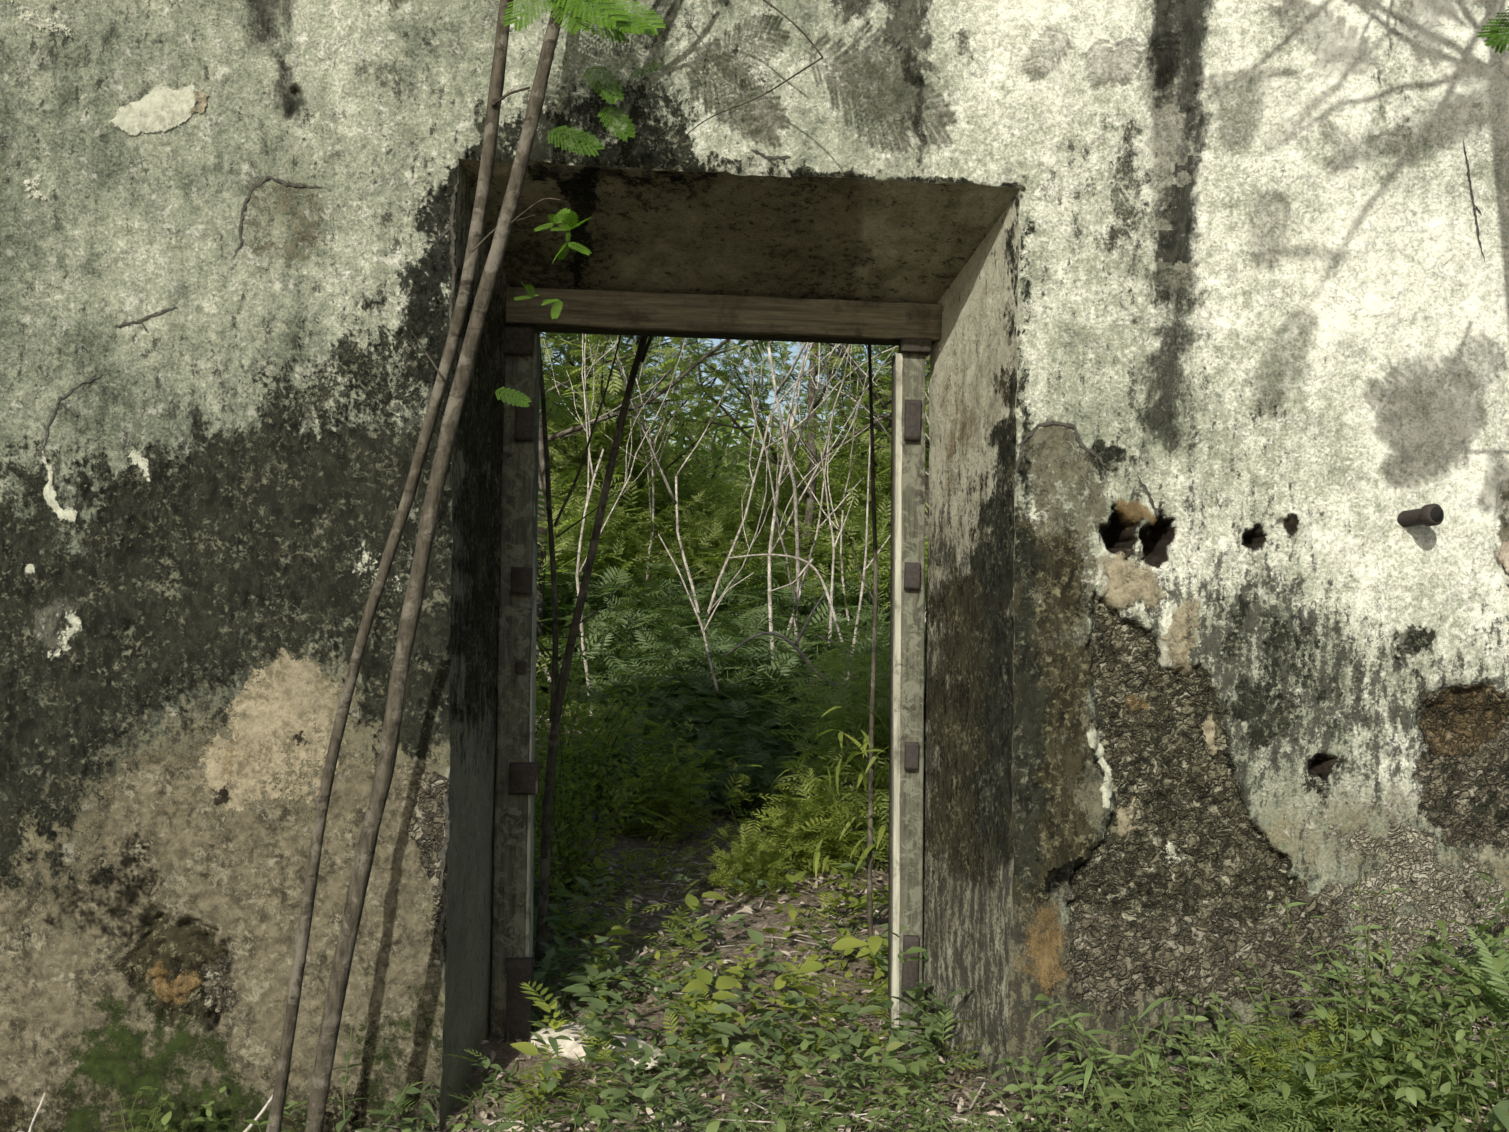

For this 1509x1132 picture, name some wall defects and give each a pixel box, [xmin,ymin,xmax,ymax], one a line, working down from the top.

peeling [109,81,208,135]
water stain [248,0,304,118]
water stain [1094,0,1213,450]
water stain [58,446,194,586]
water stain [1084,439,1151,484]
water stain [306,531,452,767]
water stain [0,735,106,895]
spalling [1048,486,1509,1025]